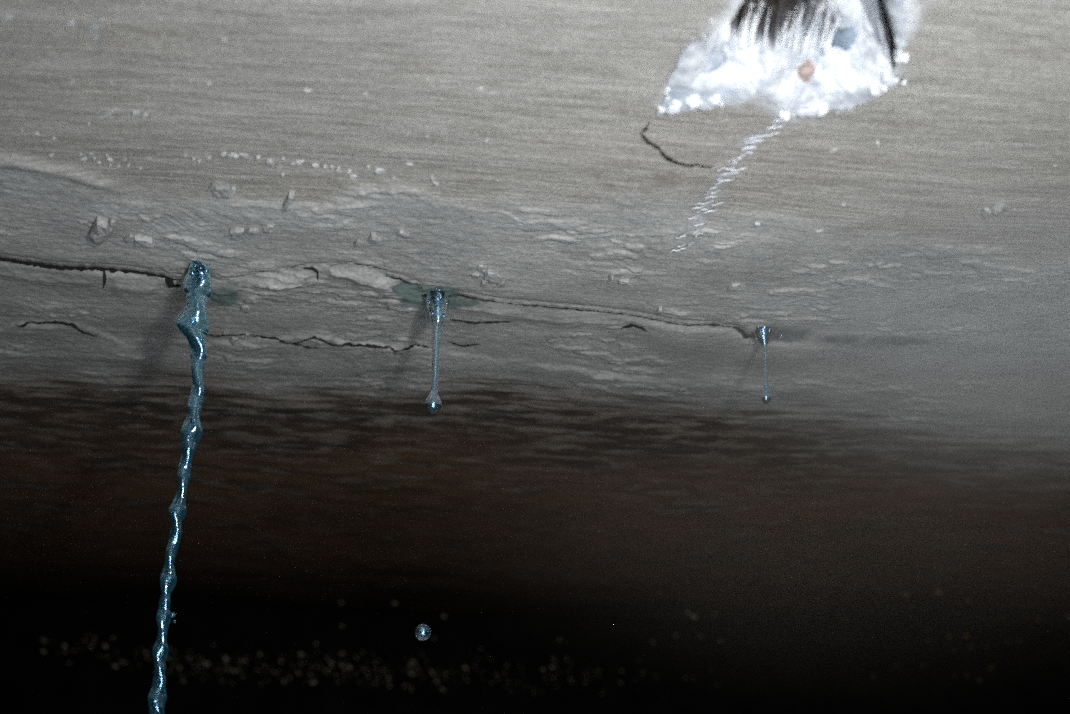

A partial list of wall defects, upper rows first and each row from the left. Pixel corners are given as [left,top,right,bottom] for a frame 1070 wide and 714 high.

crack [641,124,714,168]
water stain [671,120,783,253]
peeling [89,216,154,248]
crack [0,257,181,288]
crack [385,275,422,289]
crack [16,321,99,337]
crack [210,294,756,353]
water stain [41,261,606,714]